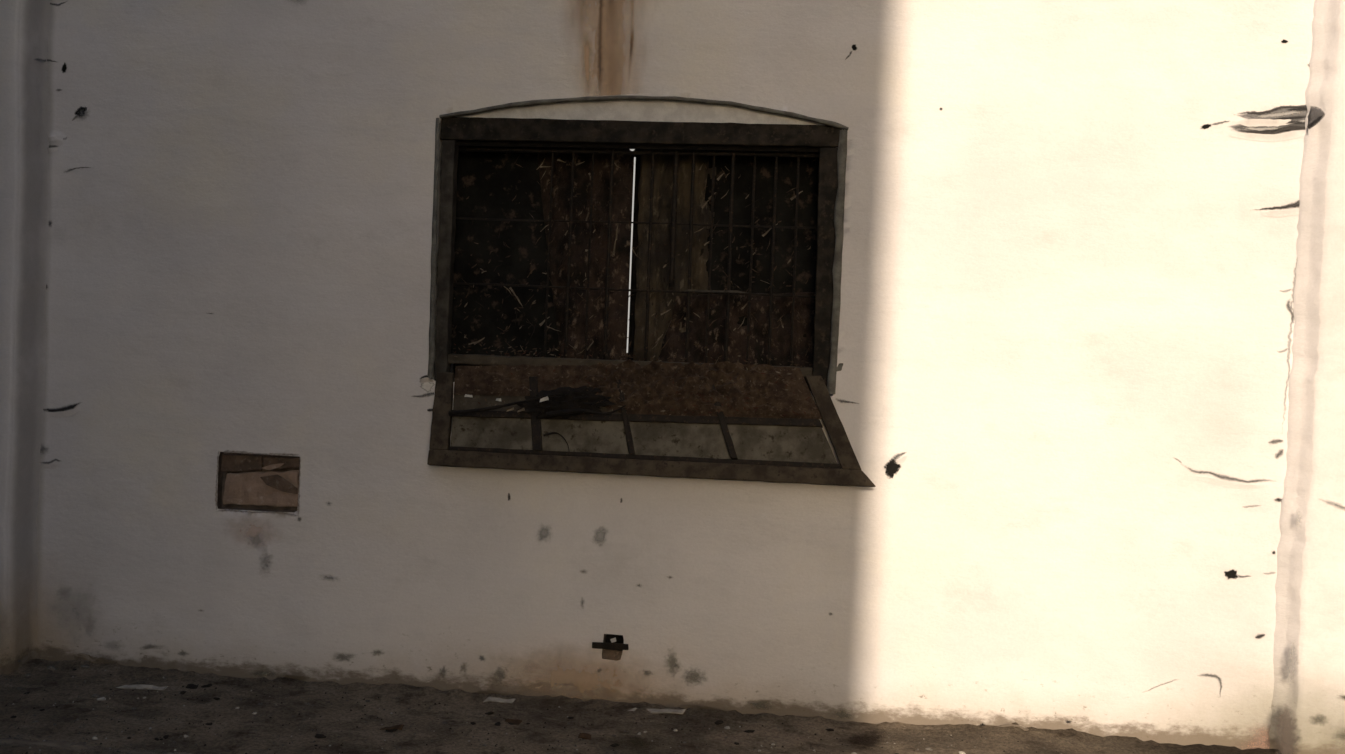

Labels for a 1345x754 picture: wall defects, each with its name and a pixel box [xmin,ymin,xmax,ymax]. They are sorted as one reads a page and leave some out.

corrosion [585,0,633,96]